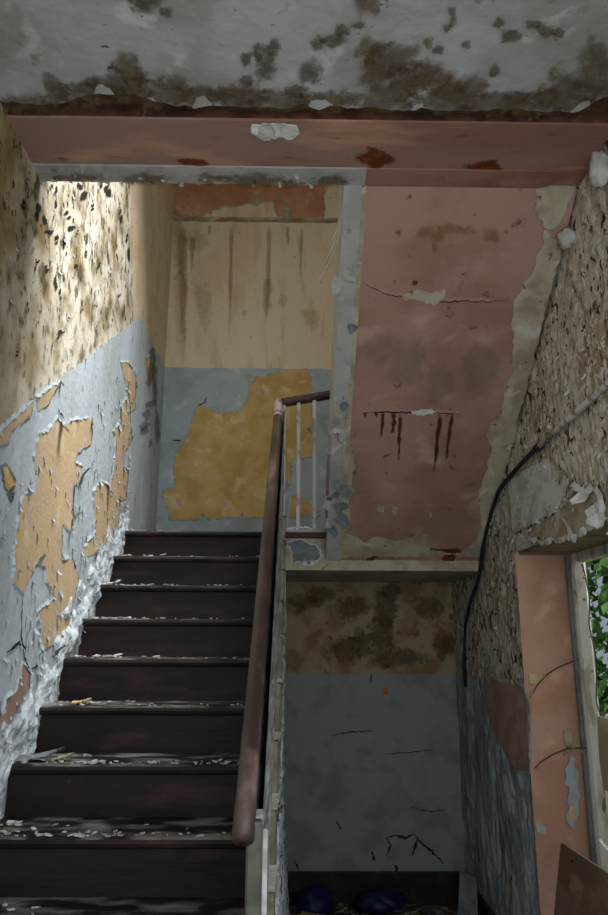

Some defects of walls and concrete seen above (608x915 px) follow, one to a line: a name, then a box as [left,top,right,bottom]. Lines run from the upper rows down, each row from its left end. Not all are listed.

leakage [130,0,171,17]
leakage [312,22,364,49]
leakage [493,18,564,43]
leakage [0,37,608,117]
flaking render [250,123,299,141]
leakage [22,175,111,255]
corrosion [363,412,402,459]
corrosion [435,415,453,463]
peeling [161,368,355,566]
crack [7,595,39,674]
peeling [563,730,581,830]
crack [371,834,444,871]